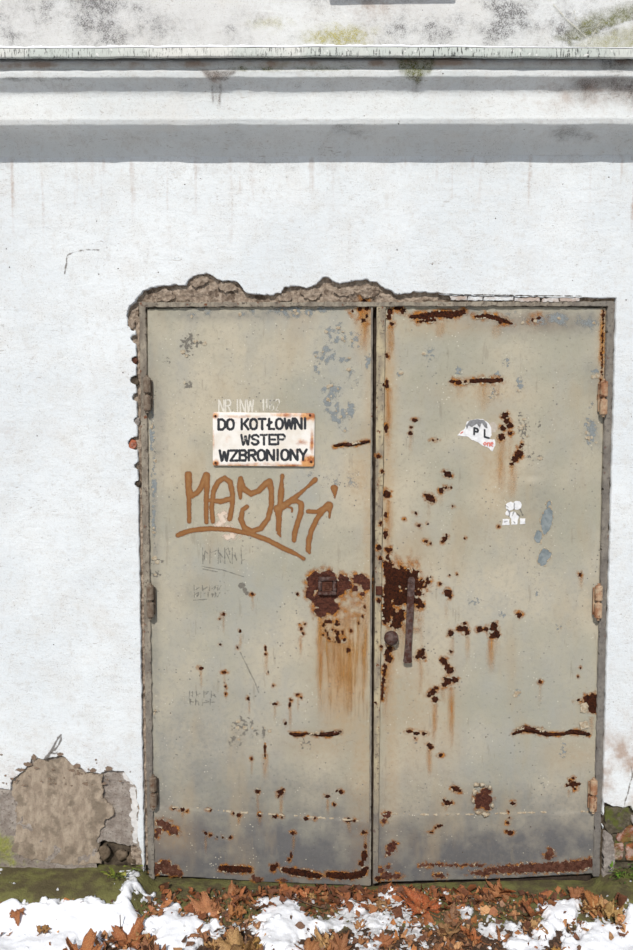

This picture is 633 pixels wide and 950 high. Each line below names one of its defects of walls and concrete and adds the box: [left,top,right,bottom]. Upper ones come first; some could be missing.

corrosion [386,306,513,328]
corrosion [382,379,390,433]
corrosion [497,412,524,468]
flaking render [0,274,615,871]
corrosion [296,512,458,682]
corrosion [374,645,394,704]
corrosion [417,846,593,879]
flaking render [599,802,633,877]